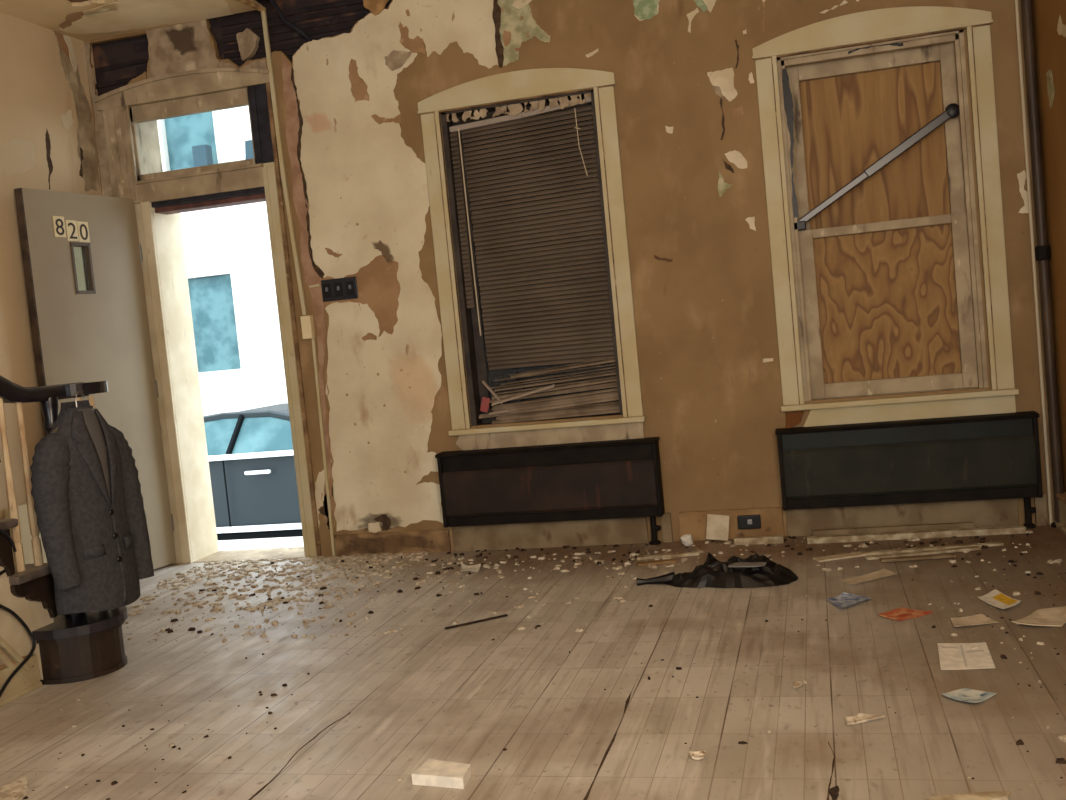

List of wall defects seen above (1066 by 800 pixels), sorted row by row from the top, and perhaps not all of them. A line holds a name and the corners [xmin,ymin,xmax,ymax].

peeling [633,0,660,21]
peeling [687,0,717,33]
peeling [1057,16,1066,37]
peeling [446,93,591,122]
peeling [707,68,744,120]
peeling [717,150,747,197]
peeling [53,0,551,531]
crack [583,679,637,800]